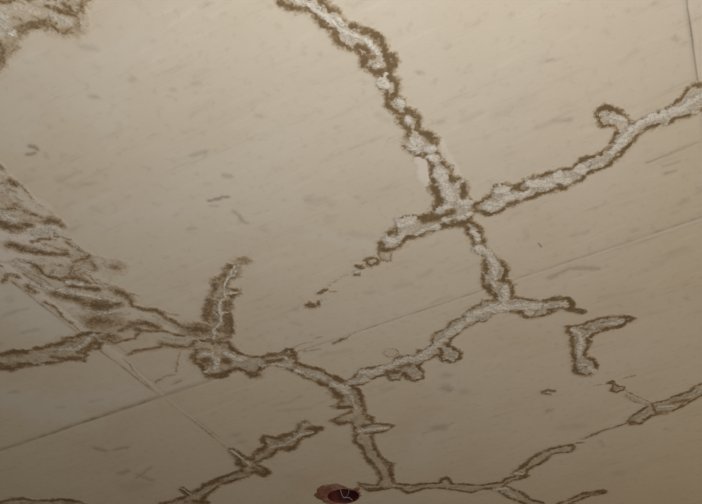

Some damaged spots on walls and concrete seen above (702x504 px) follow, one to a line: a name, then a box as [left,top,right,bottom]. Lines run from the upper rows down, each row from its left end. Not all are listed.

crack [153,0,702,504]
crack [0,330,105,375]
crack [0,495,93,504]